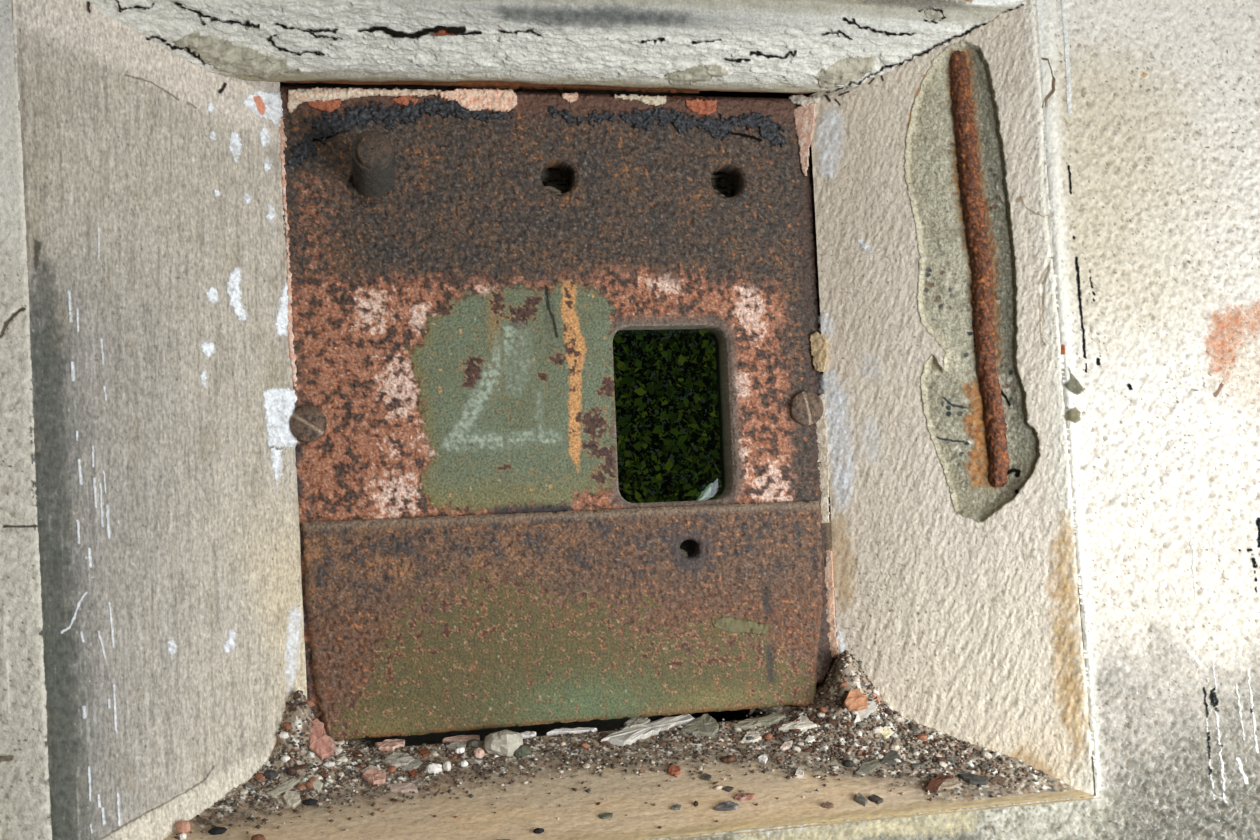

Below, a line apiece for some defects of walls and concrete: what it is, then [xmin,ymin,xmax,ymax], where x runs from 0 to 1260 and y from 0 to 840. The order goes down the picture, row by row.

peeling [853,0,972,9]
crack [87,0,543,108]
crack [641,4,1024,106]
spalling [904,40,1041,523]
rust [1208,311,1260,371]
rust [963,380,999,488]
damp [1236,668,1259,753]
damp [1207,712,1248,803]
damp [726,811,973,840]